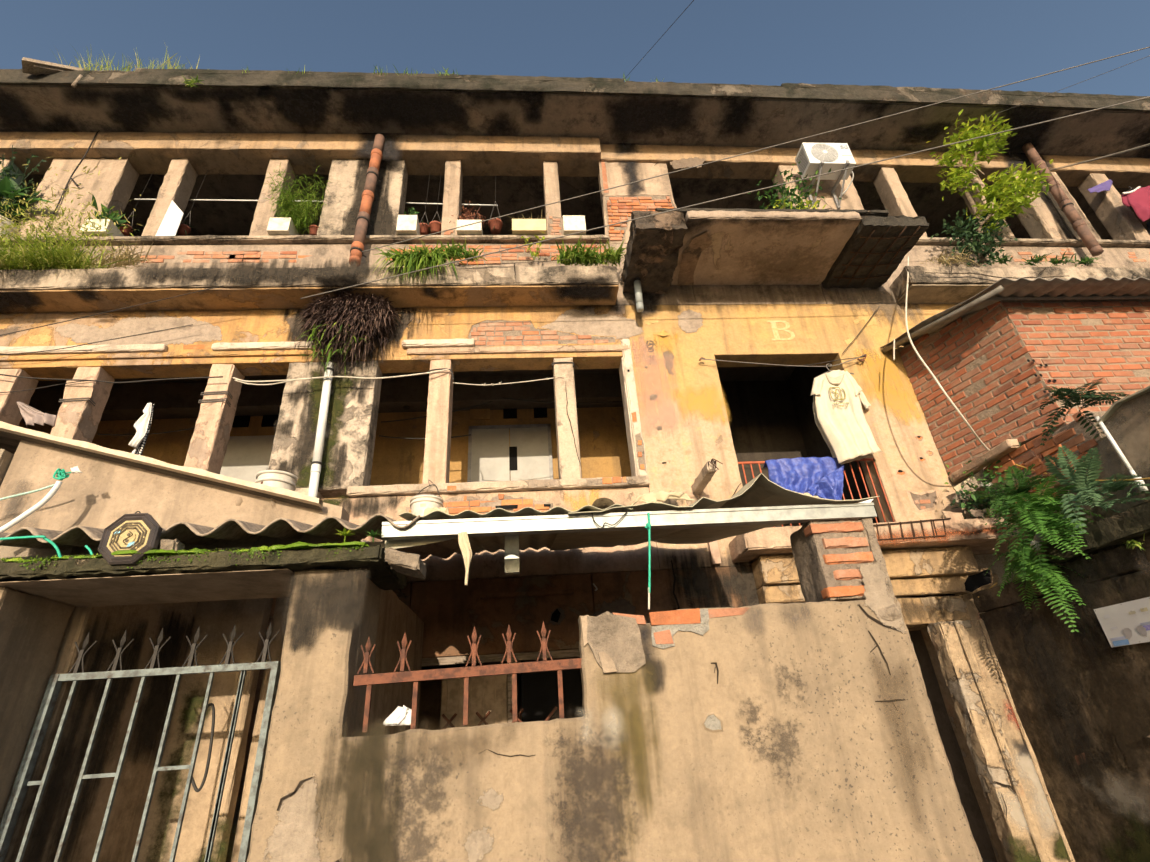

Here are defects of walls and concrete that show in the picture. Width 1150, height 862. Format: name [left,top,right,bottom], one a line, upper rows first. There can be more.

water stain [65,85,543,235]
water stain [0,289,44,314]
water stain [267,308,416,479]
flaking render [466,308,659,347]
peeling [663,350,675,375]
flaking render [443,485,553,515]
water stain [1043,544,1123,665]
water stain [9,611,210,862]
peeling [598,651,617,673]
water stain [611,625,663,777]
peeling [263,773,351,862]
crack [994,781,1016,817]